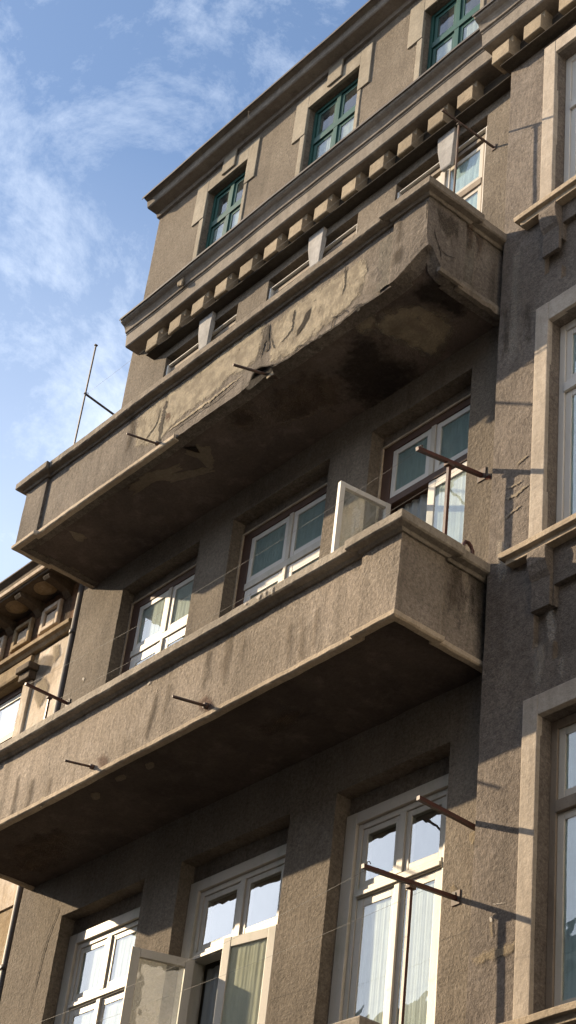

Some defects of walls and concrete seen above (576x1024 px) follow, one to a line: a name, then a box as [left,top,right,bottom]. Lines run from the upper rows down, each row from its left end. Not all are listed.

crack [259,266,385,365]
crack [144,401,168,442]